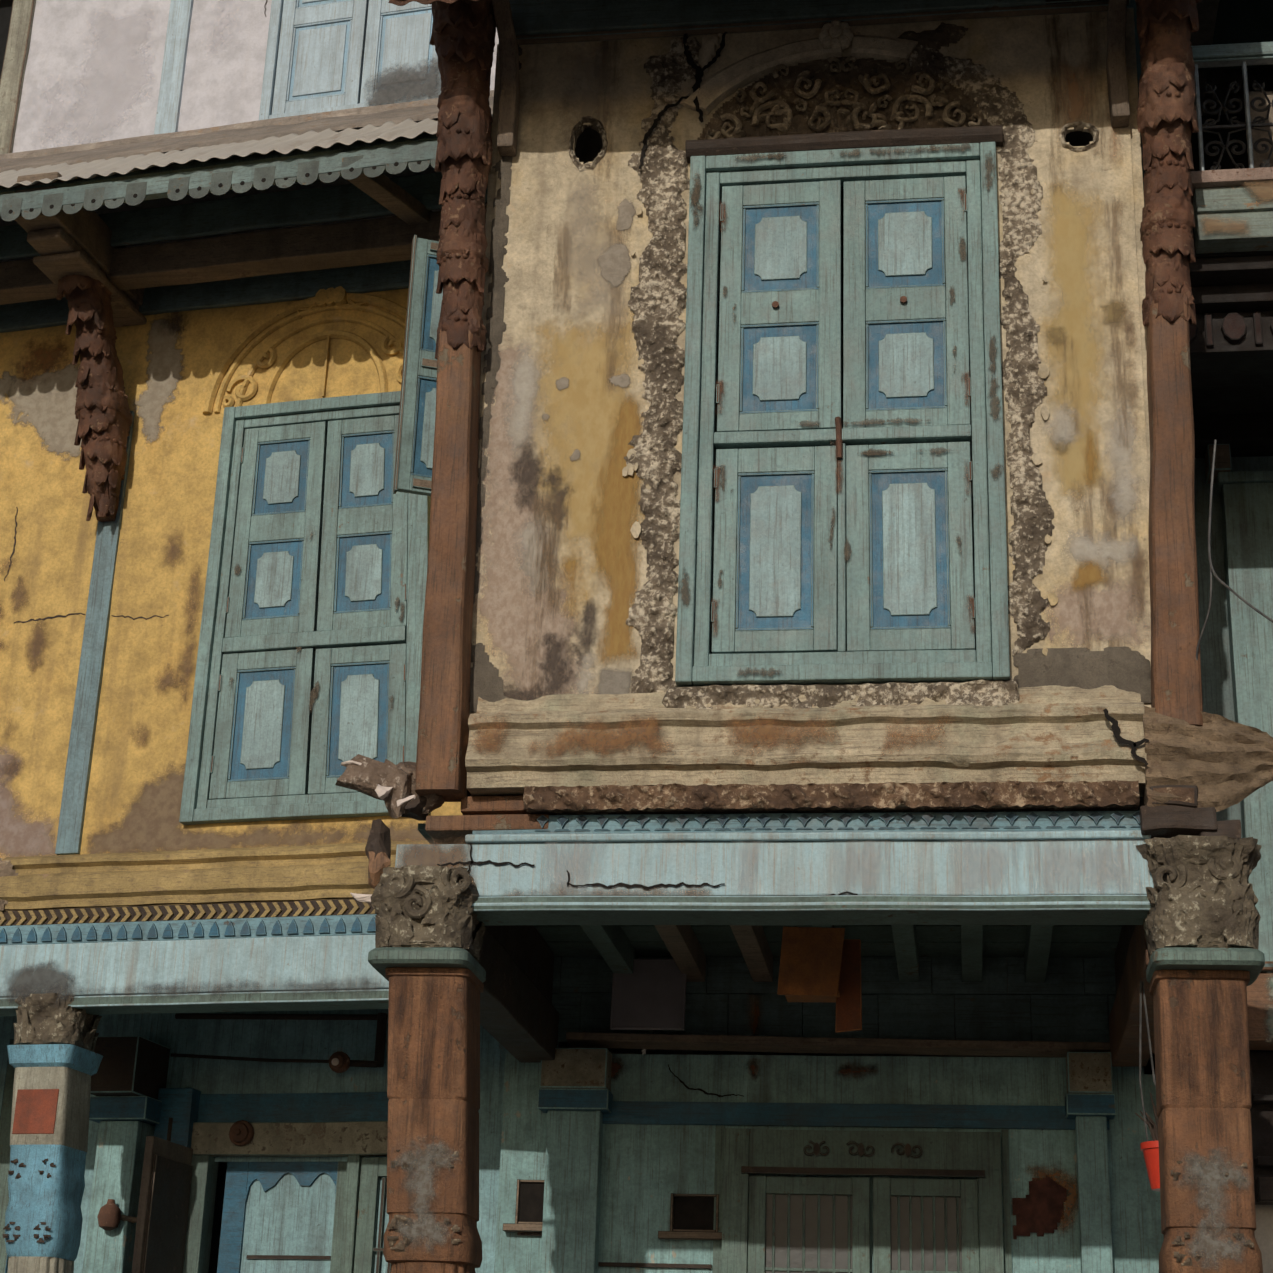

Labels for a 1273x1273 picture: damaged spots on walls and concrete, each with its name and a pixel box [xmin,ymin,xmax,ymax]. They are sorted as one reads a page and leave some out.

mould [368,58,441,106]
crack [639,32,727,169]
peeling [0,363,82,461]
peeling [134,319,184,442]
flaking render [597,33,722,693]
flaking render [898,22,1064,656]
leakage [475,291,645,701]
crack [14,613,169,623]
crack [1103,708,1150,766]
crack [437,844,535,872]
crack [566,870,725,890]
rust [1027,1166,1078,1230]